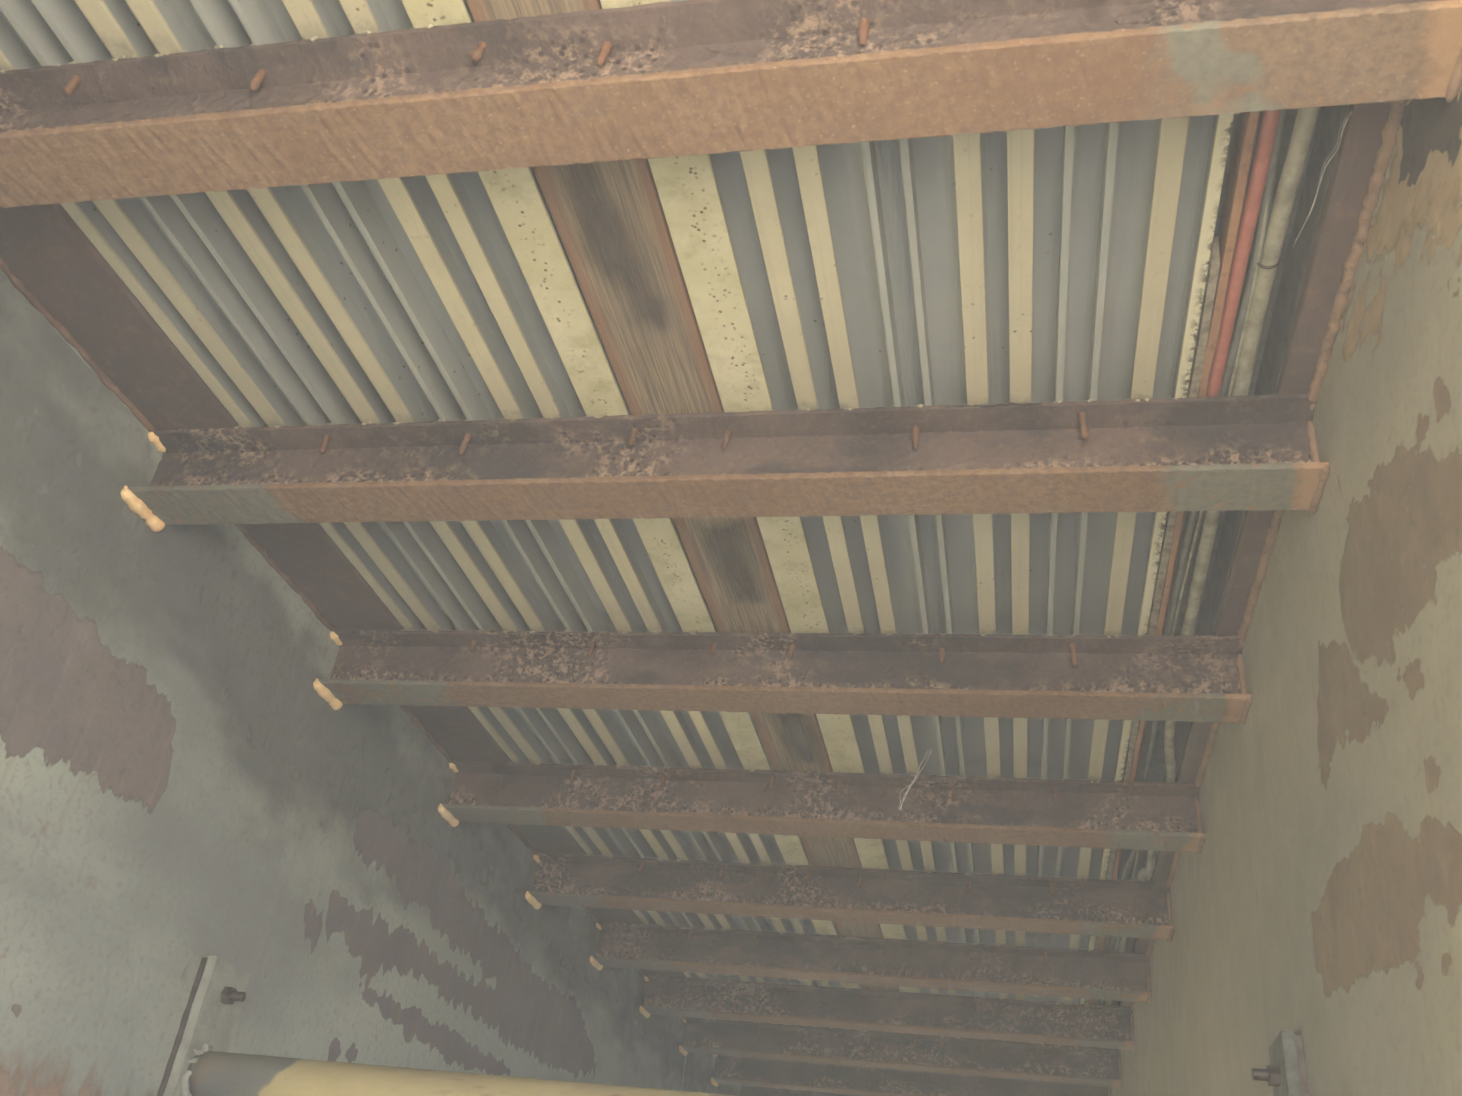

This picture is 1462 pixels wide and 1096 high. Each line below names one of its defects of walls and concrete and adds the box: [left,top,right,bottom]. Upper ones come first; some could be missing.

peeling [1398,91,1462,187]
peeling [1317,640,1375,791]